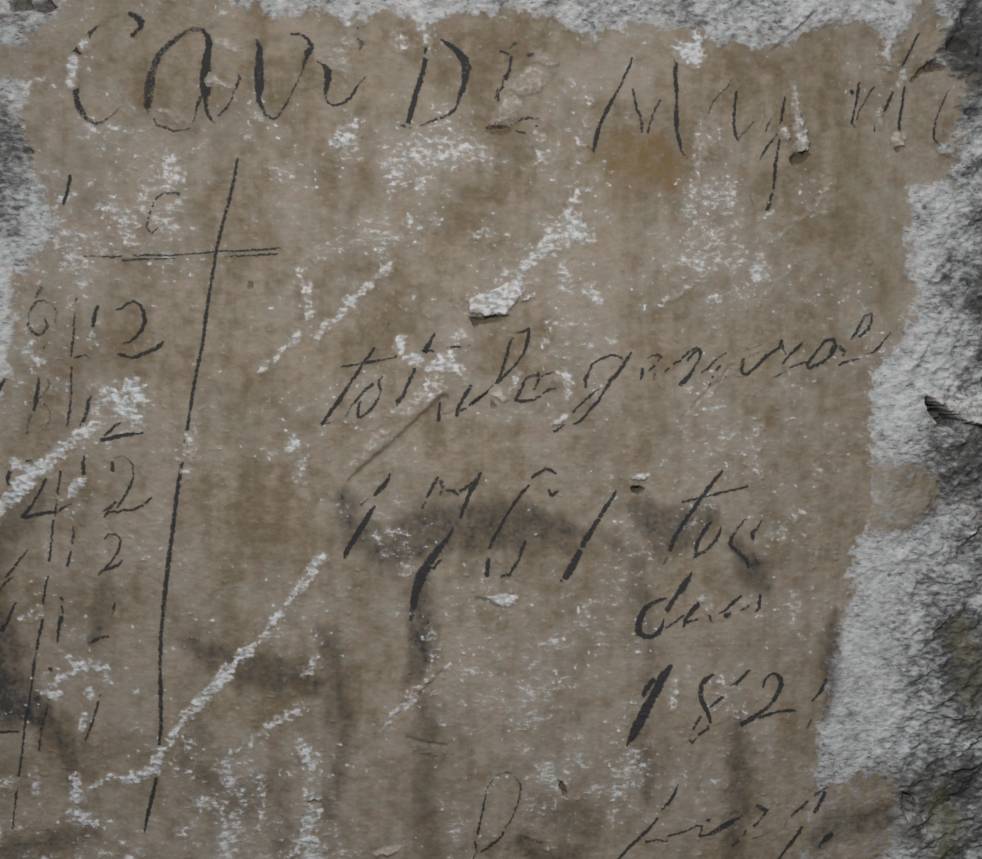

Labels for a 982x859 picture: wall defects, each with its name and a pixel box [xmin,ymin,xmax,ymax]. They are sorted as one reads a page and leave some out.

peeling [148,34,204,129]
peeling [897,0,959,74]
peeling [23,347,51,370]
spalling [916,384,982,429]
leakage [0,479,55,579]
spalling [0,416,109,528]
peeling [850,447,956,548]
leakage [0,603,90,794]
peeling [77,549,332,859]
leakage [172,620,339,709]
peeling [0,732,90,835]
peeling [793,759,906,833]